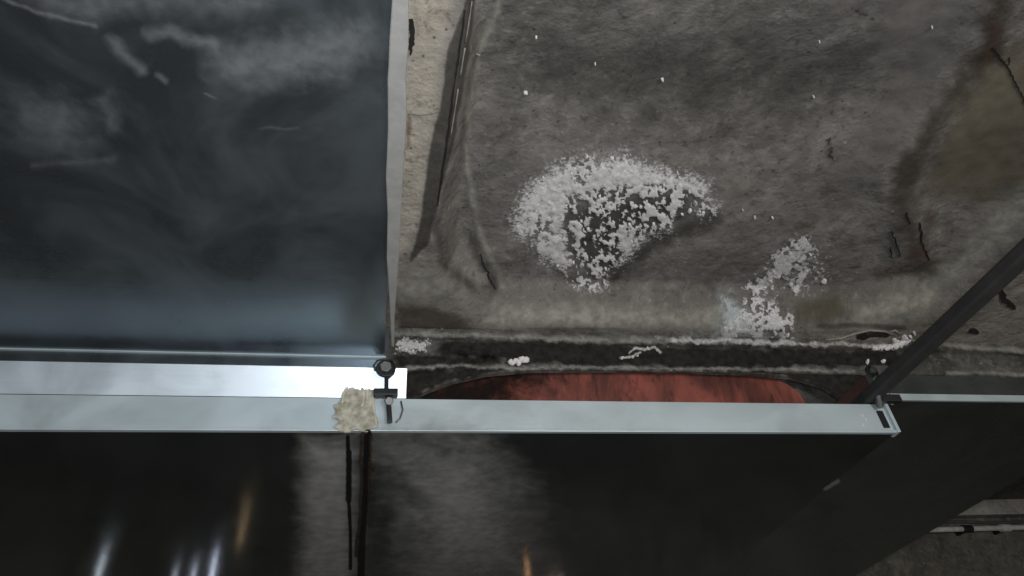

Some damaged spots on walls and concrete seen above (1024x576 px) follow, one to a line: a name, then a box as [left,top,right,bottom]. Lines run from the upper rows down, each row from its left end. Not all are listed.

crack [993,48,1024,101]
water stain [394,0,1024,400]
crack [889,212,930,261]